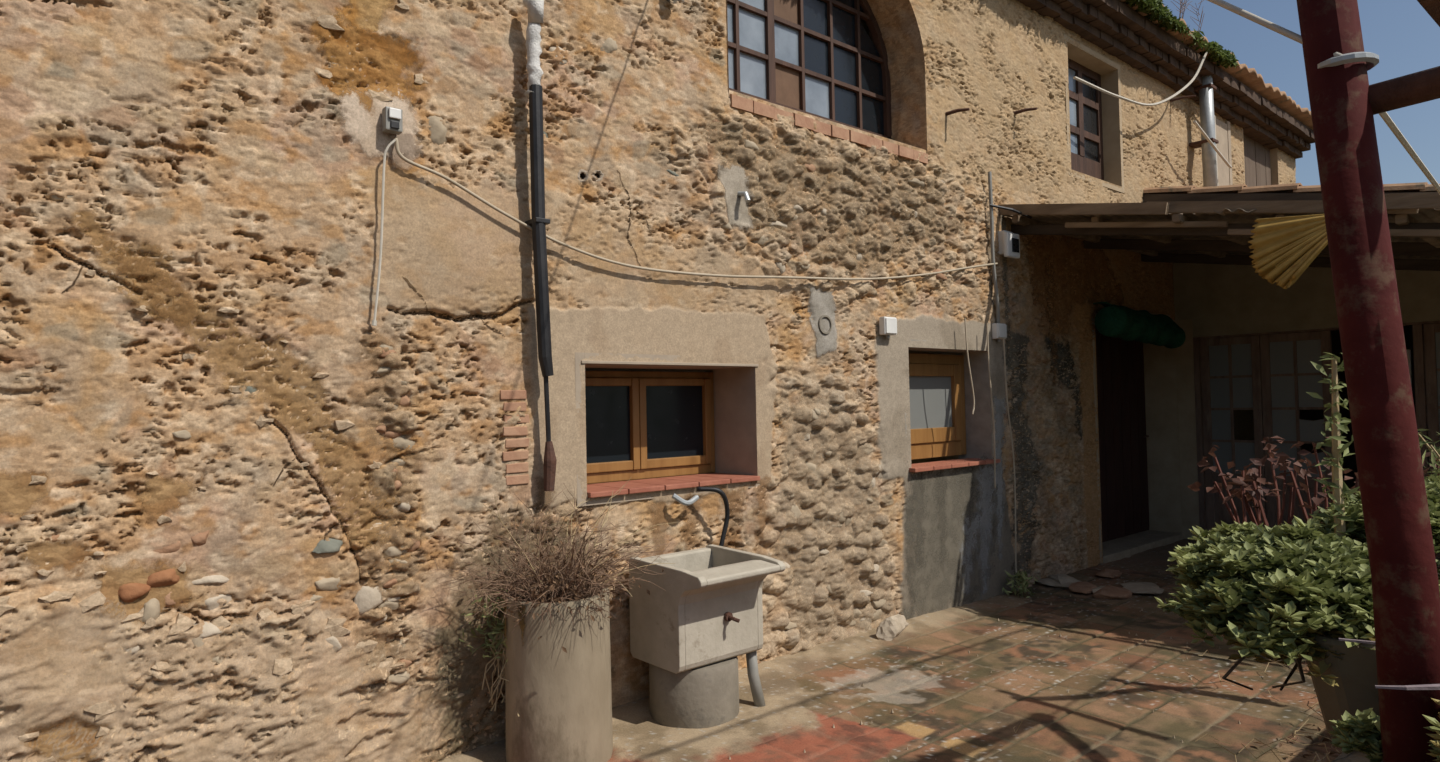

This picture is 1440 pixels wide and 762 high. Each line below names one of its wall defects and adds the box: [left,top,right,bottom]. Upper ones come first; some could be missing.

crack [387,277,532,337]
damp [901,255,1083,620]